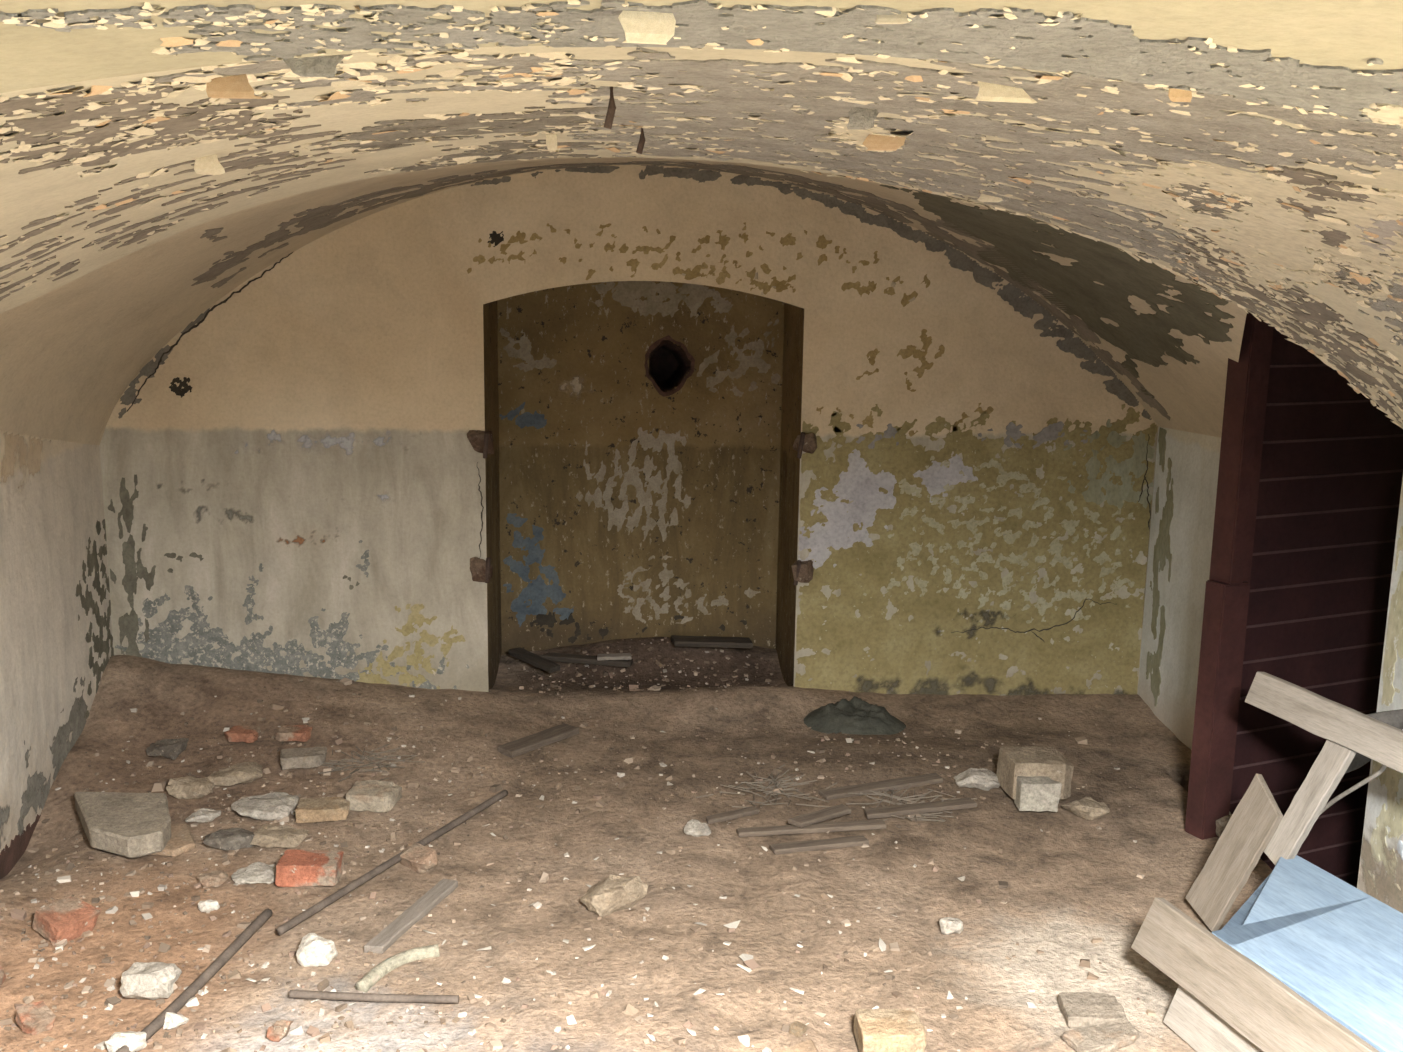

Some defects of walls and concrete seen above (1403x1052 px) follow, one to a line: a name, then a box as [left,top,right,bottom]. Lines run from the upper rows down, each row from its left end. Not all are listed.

peeling [0,0,1403,706]
spalling [0,813,42,879]
peeling [1362,760,1403,900]